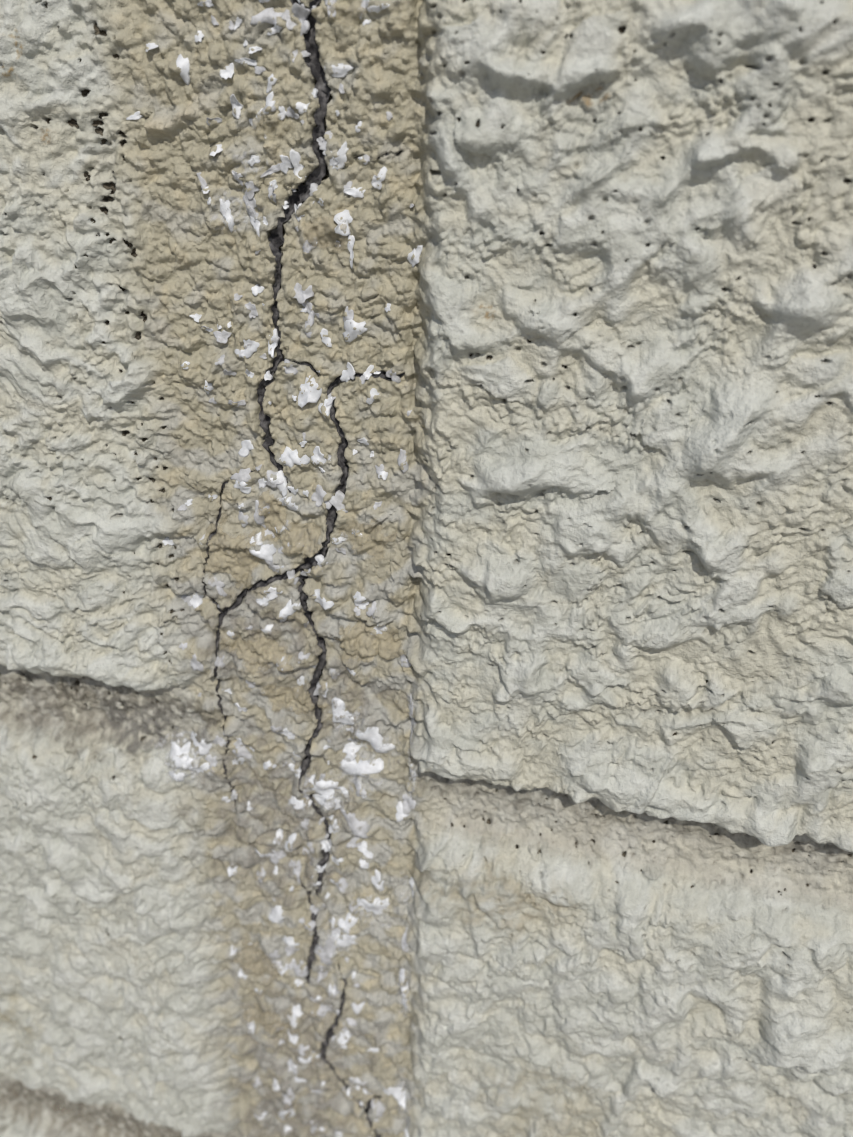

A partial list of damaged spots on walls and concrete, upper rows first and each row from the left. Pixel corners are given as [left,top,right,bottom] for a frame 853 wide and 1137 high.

crack [202,0,405,1137]